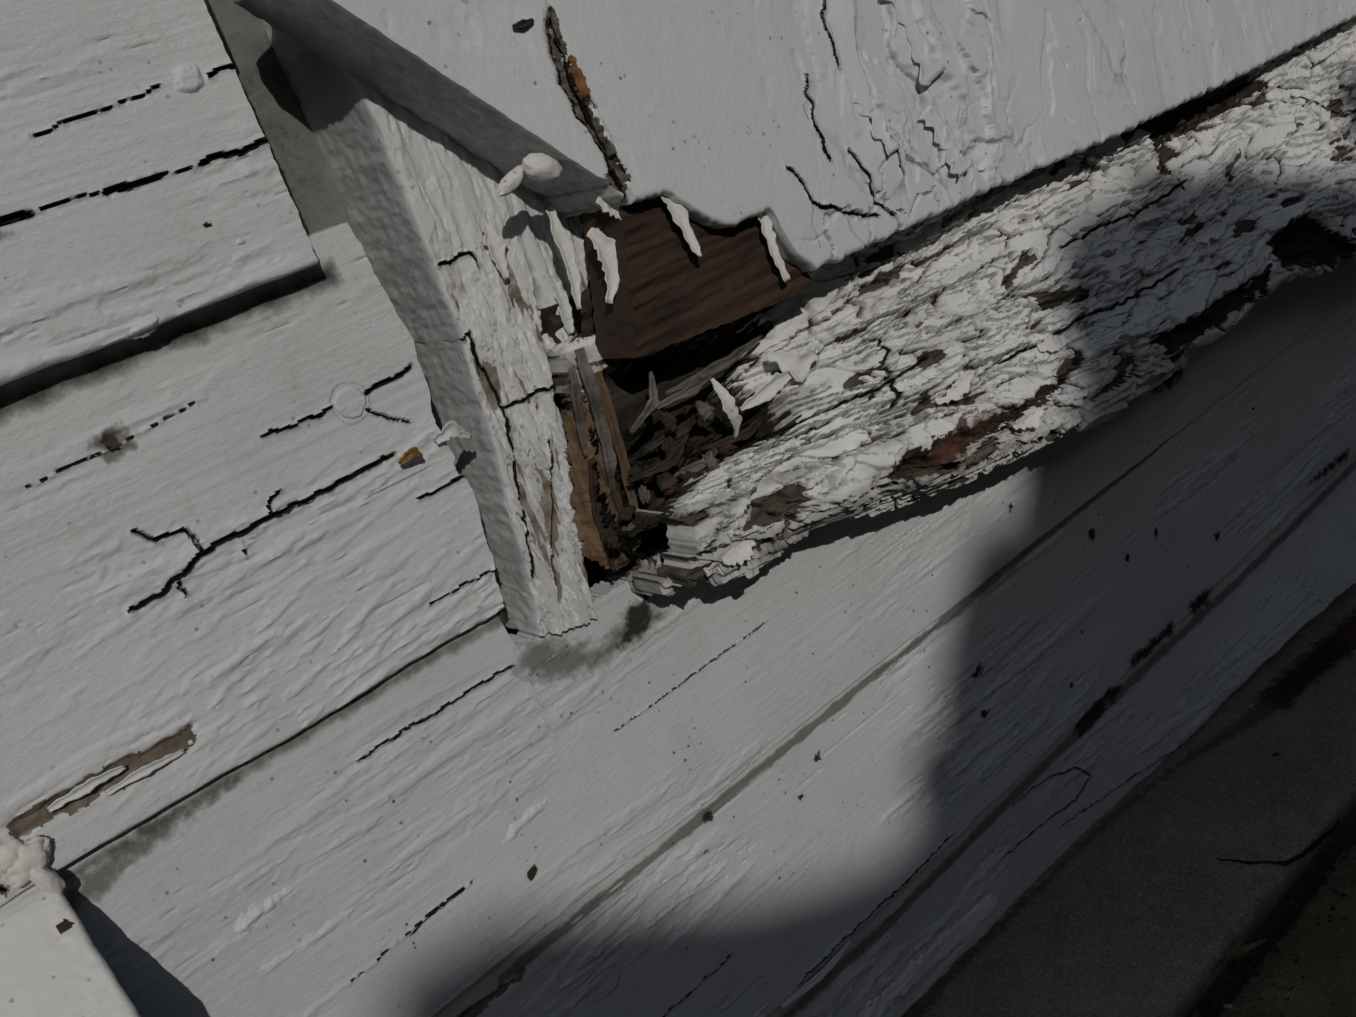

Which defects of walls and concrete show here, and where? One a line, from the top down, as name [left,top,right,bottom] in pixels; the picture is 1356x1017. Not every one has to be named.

crack [787,0,904,248]
crack [0,140,269,224]
peeling [1148,263,1273,355]
crack [261,366,412,436]
crack [461,331,559,601]
peeling [545,194,819,554]
peeling [934,372,975,405]
peeling [885,378,1070,483]
crack [130,454,394,610]
peeling [722,539,756,566]
crack [357,665,513,761]
peeling [7,725,197,839]